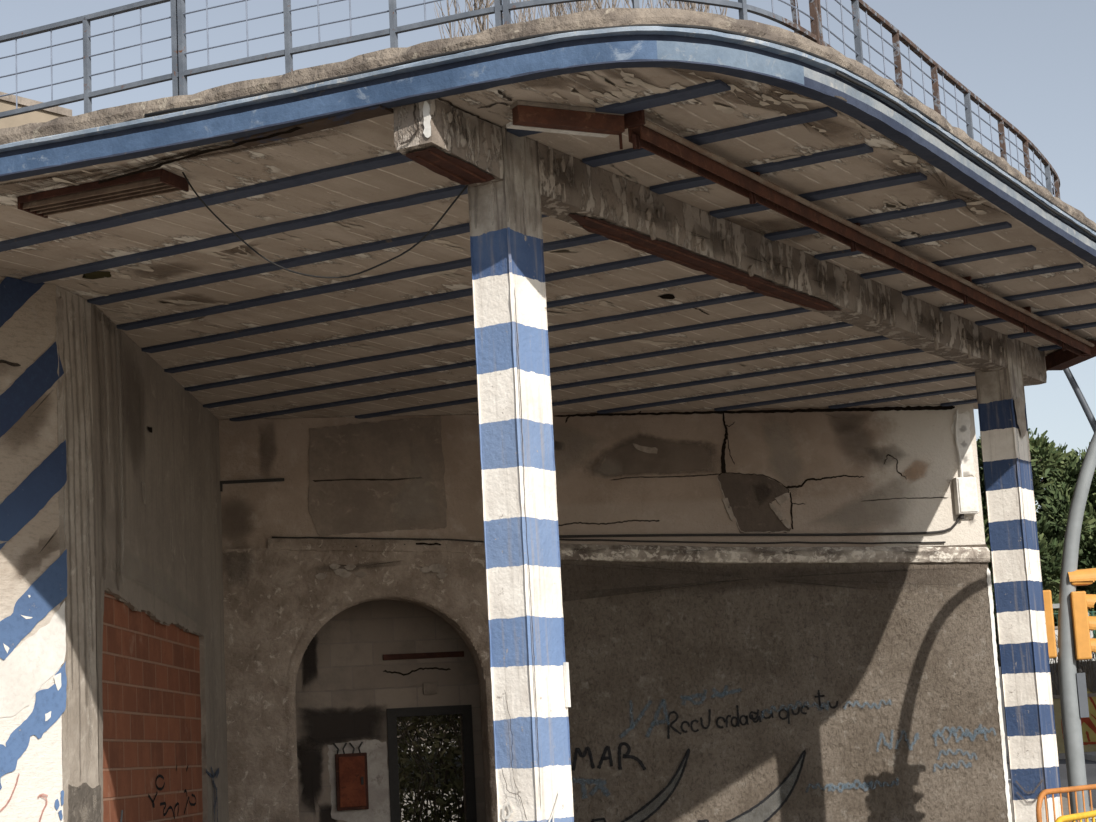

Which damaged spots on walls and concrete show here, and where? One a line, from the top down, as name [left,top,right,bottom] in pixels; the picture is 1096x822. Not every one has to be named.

peeling [967,200,988,215]
peeling [192,232,302,263]
corrosion [568,214,841,311]
crack [556,406,955,480]
crack [558,519,660,527]
flaking render [591,434,791,533]
crack [787,454,948,529]
peeling [0,601,66,718]